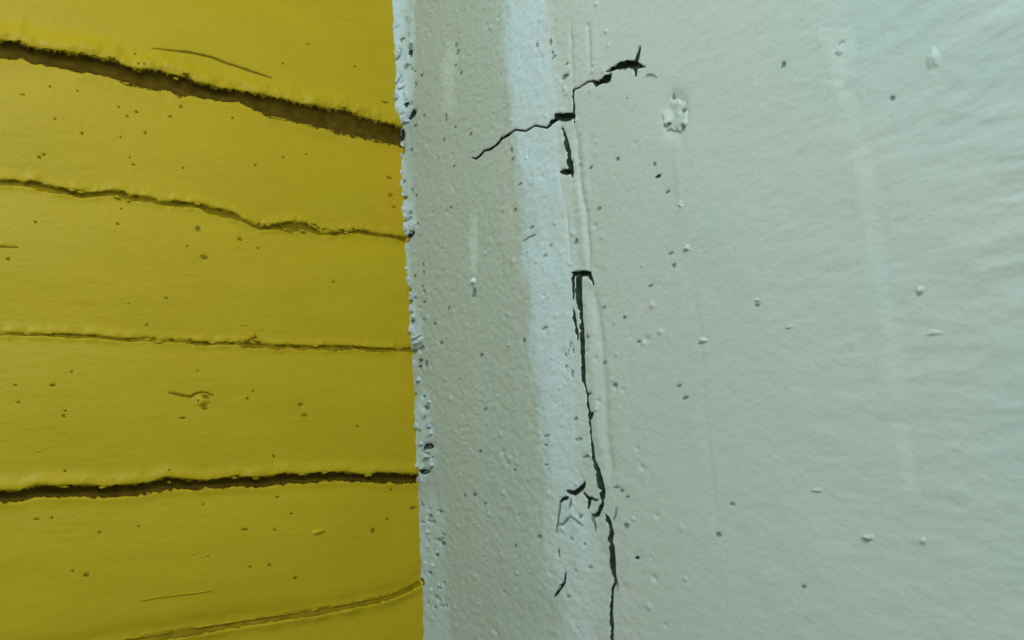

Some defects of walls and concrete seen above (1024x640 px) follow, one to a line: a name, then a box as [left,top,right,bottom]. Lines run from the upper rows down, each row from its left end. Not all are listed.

crack [0,40,404,148]
crack [471,46,657,177]
crack [0,179,406,242]
crack [0,332,415,353]
crack [554,270,618,640]
crack [0,471,417,504]
crack [125,581,422,640]